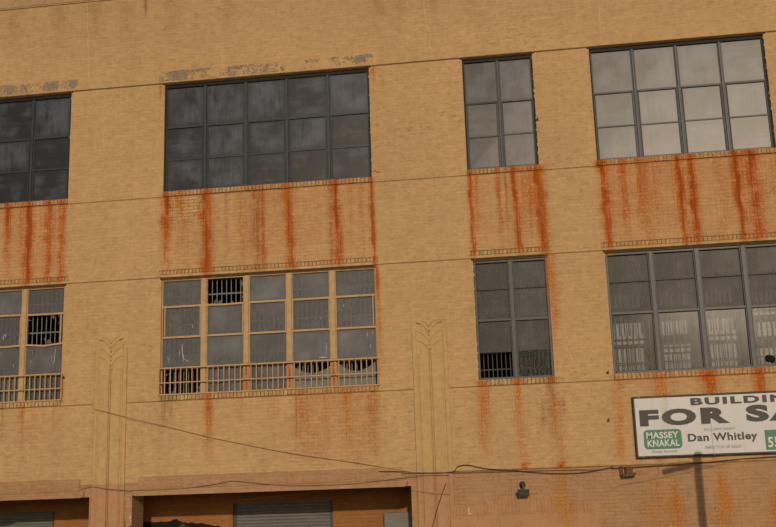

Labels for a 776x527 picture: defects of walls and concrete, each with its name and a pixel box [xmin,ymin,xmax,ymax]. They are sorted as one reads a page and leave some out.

peeling [0,79,78,99]
peeling [159,54,373,82]
rust [21,199,66,283]
rust [161,190,182,255]
rust [199,188,212,273]
rust [284,183,295,267]
rust [369,177,381,312]
rust [467,169,477,255]
rust [510,164,556,315]
rust [596,158,628,255]
rust [664,153,701,243]
rust [729,149,764,239]